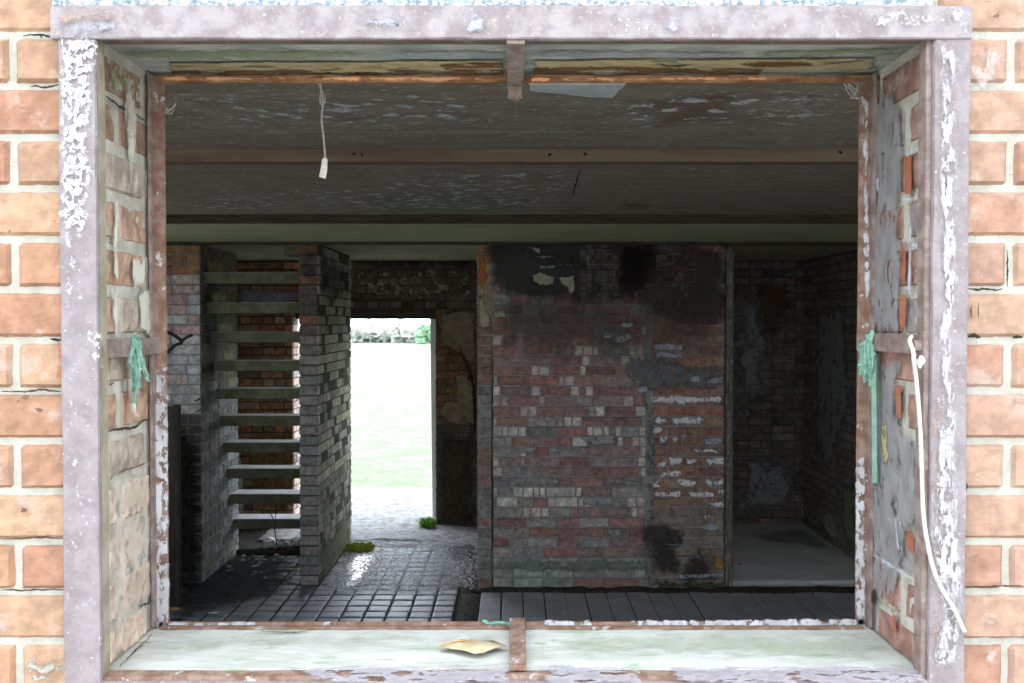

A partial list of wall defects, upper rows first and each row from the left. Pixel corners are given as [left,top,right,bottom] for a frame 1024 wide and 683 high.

peeling [55,36,97,246]
peeling [439,311,476,437]
peeling [532,247,575,294]
peeling [654,343,683,359]
peeling [861,89,912,332]
peeling [931,46,968,666]
peeling [155,374,255,628]
leakage [642,523,723,583]
peeling [631,360,915,628]